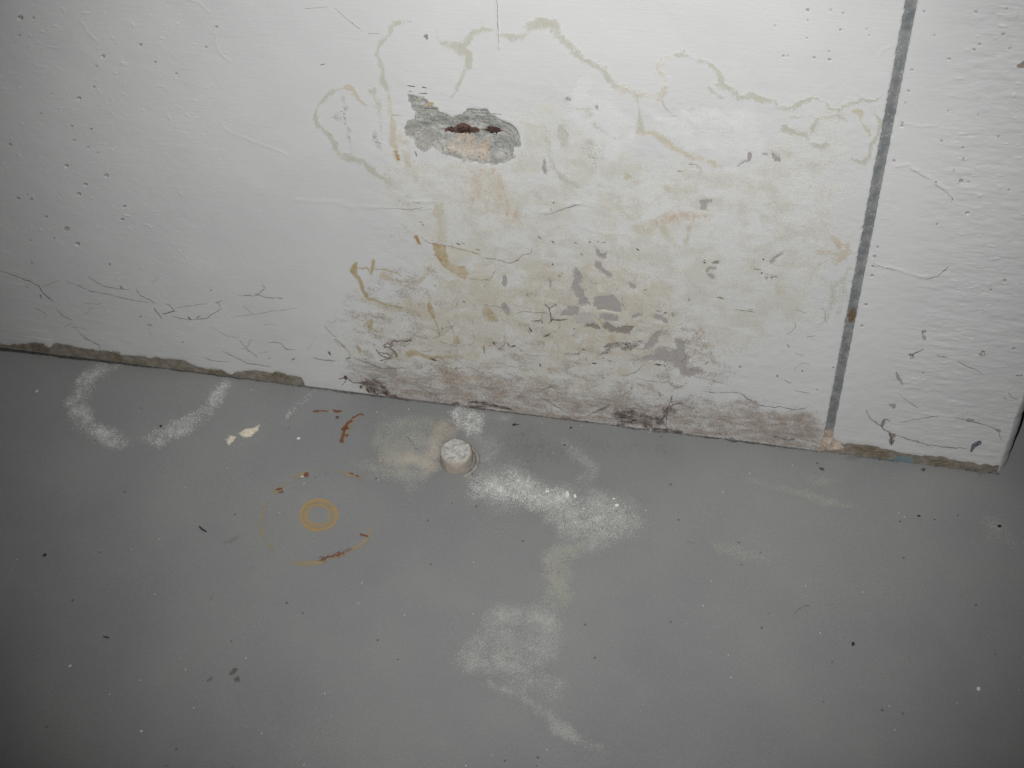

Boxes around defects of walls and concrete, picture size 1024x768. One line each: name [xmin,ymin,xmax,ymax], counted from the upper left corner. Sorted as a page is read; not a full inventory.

spalling [404,85,521,165]
crack [0,238,575,404]
peeling [0,342,305,386]
corrosion [313,409,364,444]
water stain [305,17,883,753]
crack [541,309,827,426]
crack [866,395,1002,449]
corrosion [299,498,339,532]